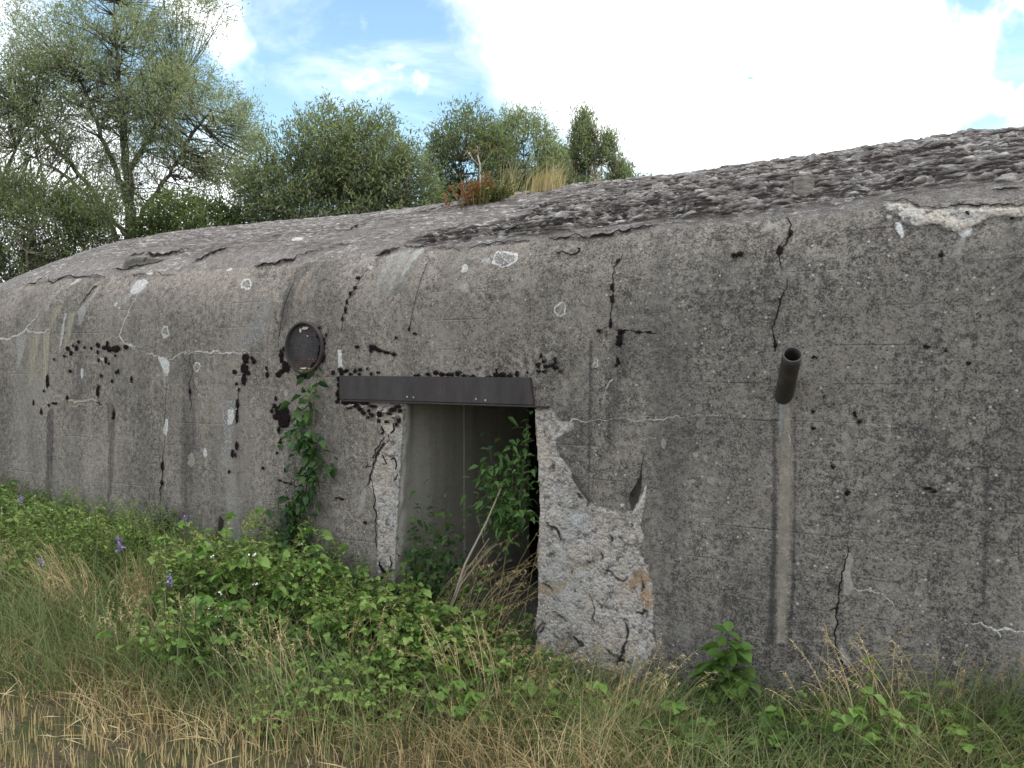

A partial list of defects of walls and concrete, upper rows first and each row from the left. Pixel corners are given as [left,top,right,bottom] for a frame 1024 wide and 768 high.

crack [256,224,358,340]
crack [341,216,656,339]
crack [771,217,793,352]
spalling [884,202,1024,253]
crack [365,434,398,547]
spalling [535,408,656,691]
water stain [768,403,795,643]
crack [830,493,894,669]